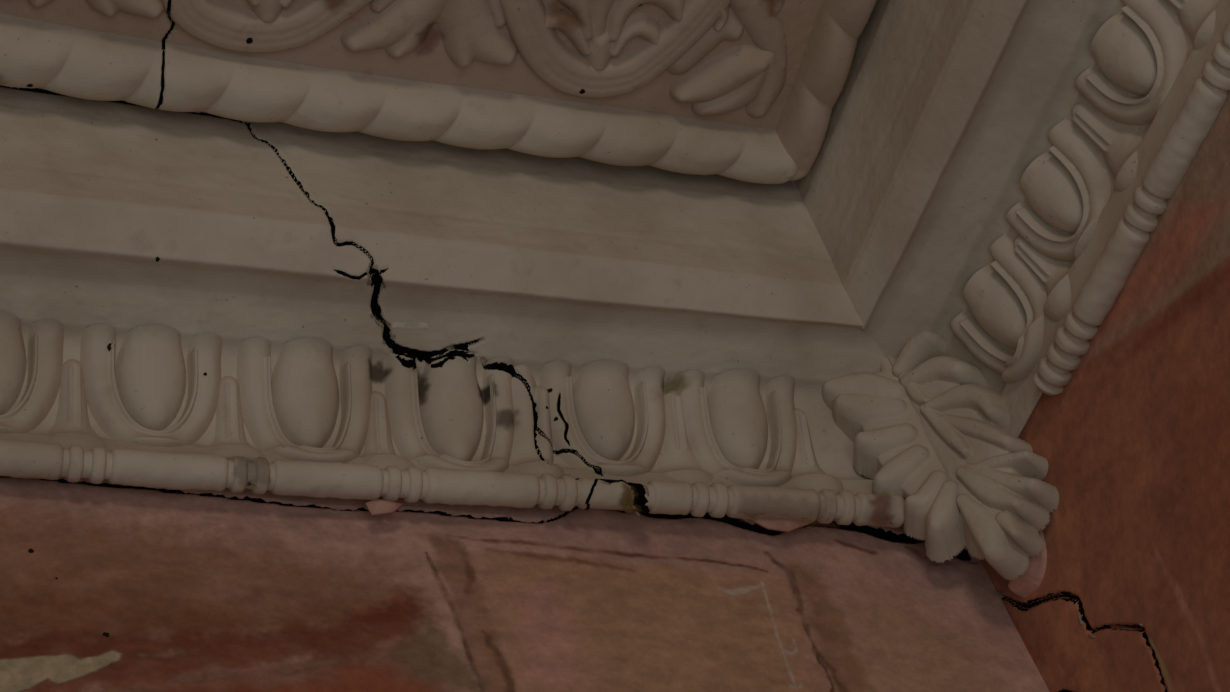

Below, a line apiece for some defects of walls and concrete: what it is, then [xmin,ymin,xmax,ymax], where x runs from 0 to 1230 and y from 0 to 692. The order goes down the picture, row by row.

crack [0,85,71,97]
crack [109,0,925,544]
crack [0,476,368,511]
crack [954,549,971,561]
crack [1000,591,1167,692]
peeling [0,650,122,692]